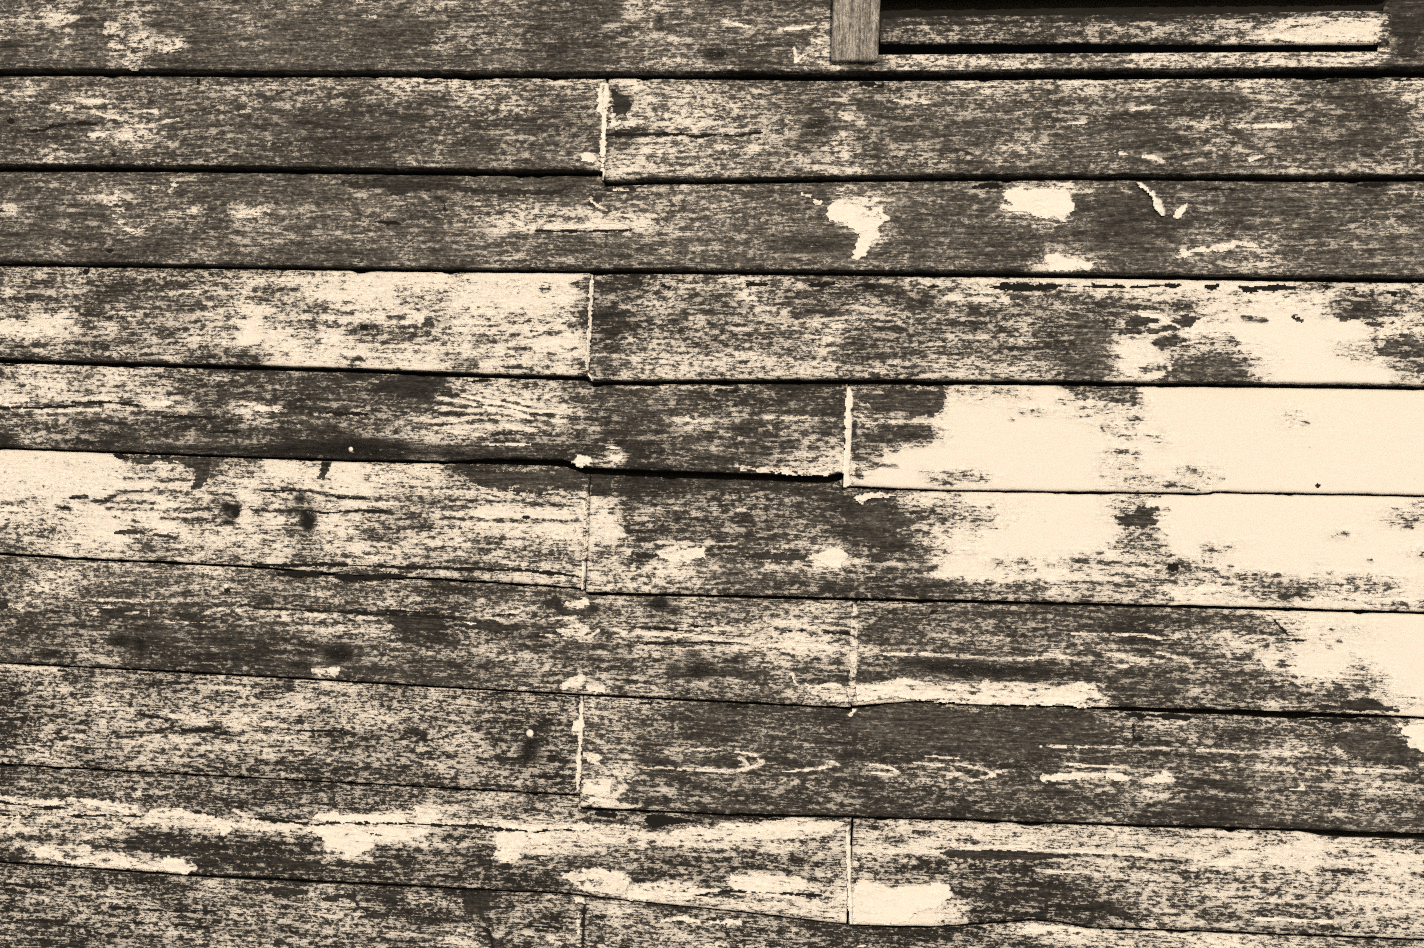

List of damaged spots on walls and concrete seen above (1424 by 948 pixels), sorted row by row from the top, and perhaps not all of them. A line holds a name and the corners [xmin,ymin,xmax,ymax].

peeling [972,182,1075,222]
peeling [1137,182,1188,219]
peeling [801,192,890,260]
spalling [989,252,1182,292]
spalling [1238,283,1296,293]
peeling [1056,314,1249,380]
peeling [1321,285,1424,374]
peeling [853,385,947,436]
peeling [1115,506,1160,528]
peeling [0,730,846,879]
peeling [561,867,821,902]
peeling [660,915,742,926]